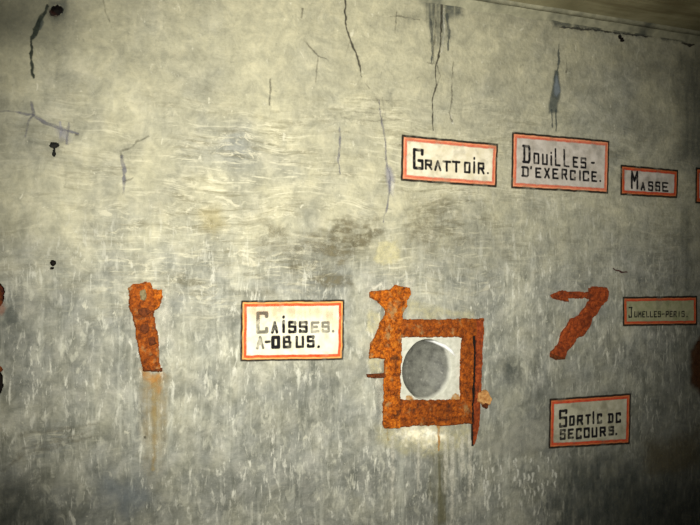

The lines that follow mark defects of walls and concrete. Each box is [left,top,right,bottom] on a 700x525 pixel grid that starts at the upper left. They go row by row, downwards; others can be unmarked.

crack [29,4,49,78]
crack [344,0,362,77]
crack [432,4,452,126]
leakage [429,3,460,62]
leakage [550,50,567,128]
crack [385,141,394,210]